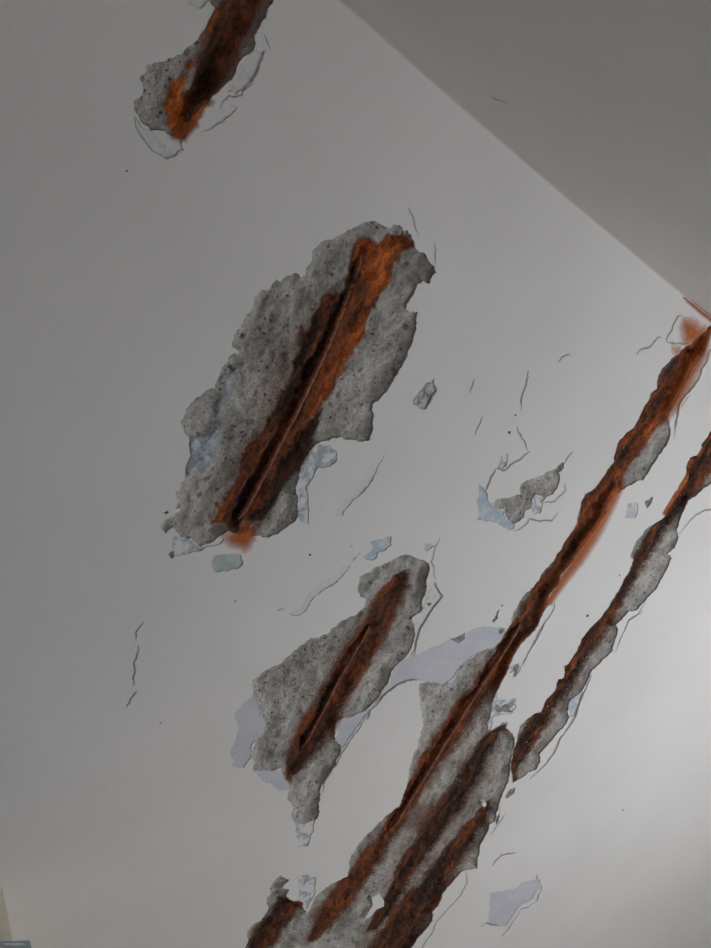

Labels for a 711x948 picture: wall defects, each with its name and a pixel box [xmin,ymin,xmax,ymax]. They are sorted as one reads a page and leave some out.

spalling [133,0,272,159]
rust [228,522,254,548]
spalling [160,221,435,572]
crack [484,370,530,493]
crack [515,452,573,531]
spalling [230,327,711,948]